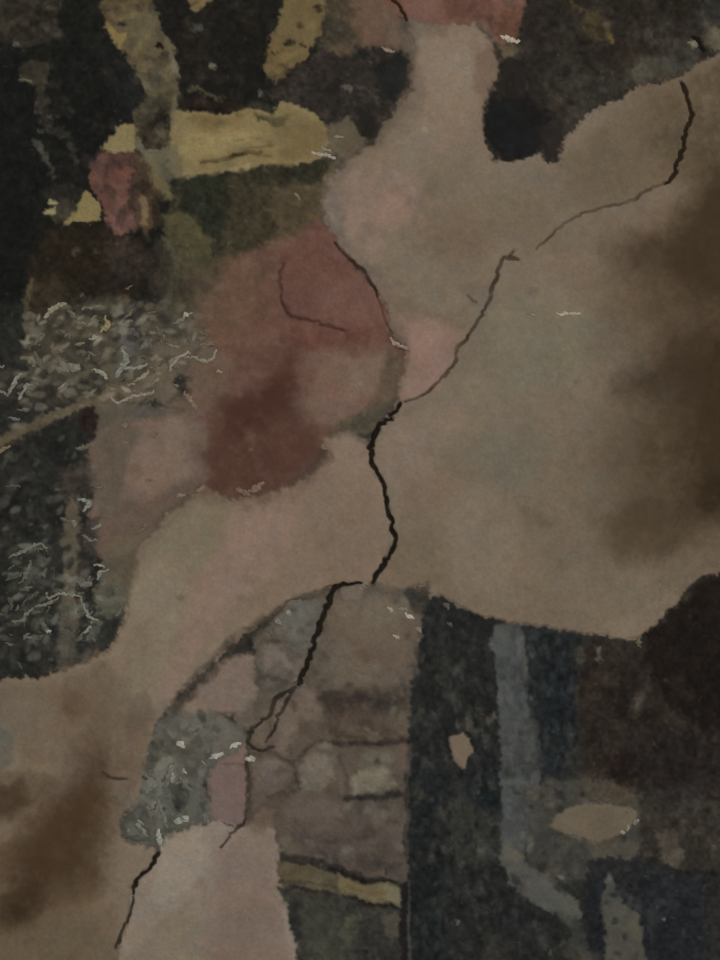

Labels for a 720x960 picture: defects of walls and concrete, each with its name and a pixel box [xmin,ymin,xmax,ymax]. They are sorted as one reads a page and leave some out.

crack [664,82,695,184]
crack [246,244,519,764]
crack [220,817,247,848]
crack [115,851,160,949]